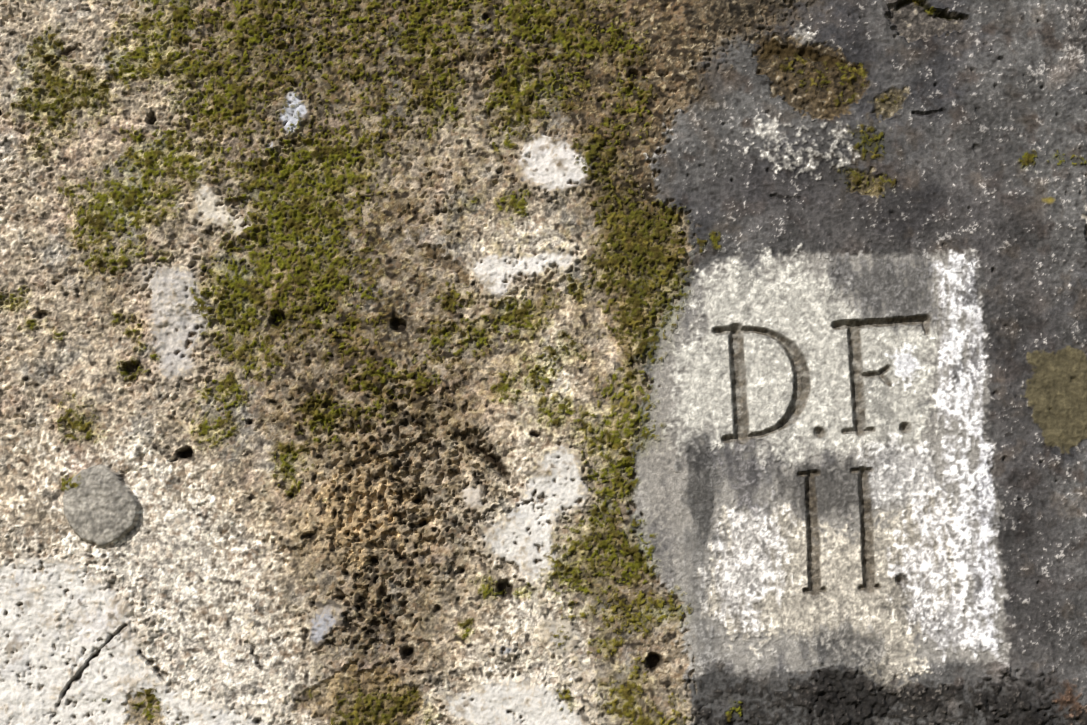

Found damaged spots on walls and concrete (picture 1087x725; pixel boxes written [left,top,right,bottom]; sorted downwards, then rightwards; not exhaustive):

crack [43,623,170,721]